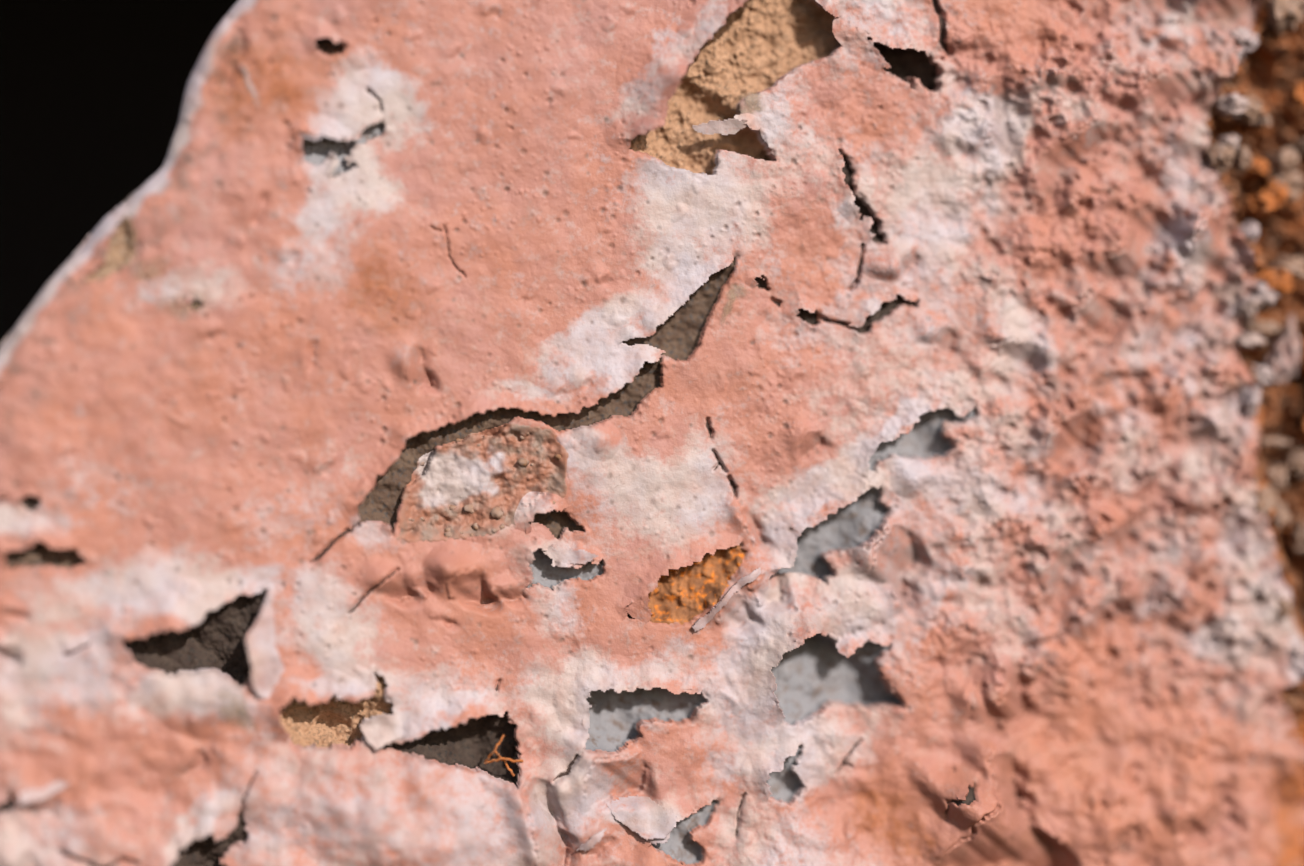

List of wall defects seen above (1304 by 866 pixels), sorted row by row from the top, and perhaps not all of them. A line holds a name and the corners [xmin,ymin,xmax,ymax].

crack [932,0,949,54]
peeling [603,0,938,175]
peeling [284,109,385,179]
crack [850,243,864,290]
peeling [780,294,819,325]
crack [820,318,856,329]
peeling [336,252,769,590]
peeling [615,391,977,727]
peeling [87,578,524,785]
peeling [552,652,706,756]
peeling [740,741,802,803]
peeling [141,800,248,866]